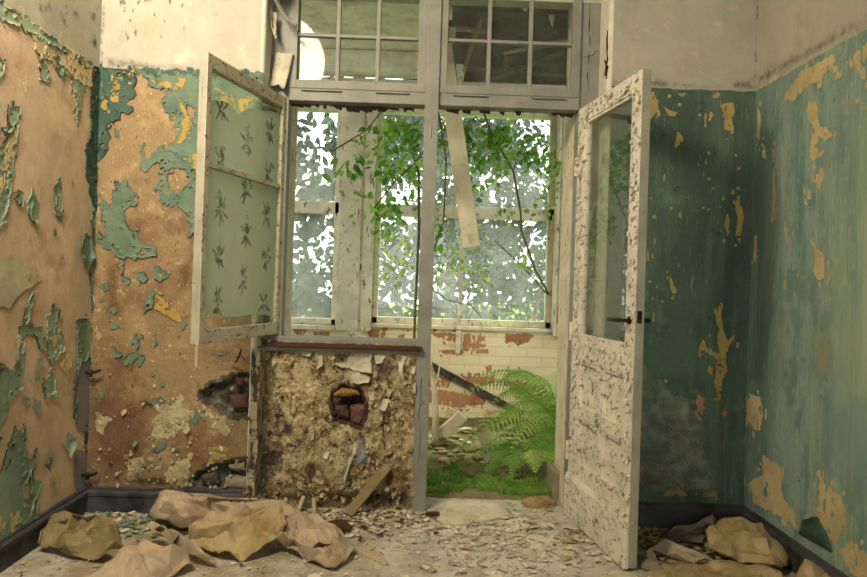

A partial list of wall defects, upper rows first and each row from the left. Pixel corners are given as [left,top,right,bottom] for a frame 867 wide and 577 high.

peeling [0,0,200,330]
peeling [240,52,293,89]
peeling [781,40,867,208]
peeling [0,255,75,539]
flaking render [187,455,251,491]
flaking render [197,350,253,421]
flaking render [328,353,393,483]
flaking render [431,329,489,357]
flaking render [429,365,536,411]
leakage [639,366,717,492]
peeling [693,303,740,422]
peeling [744,455,867,577]